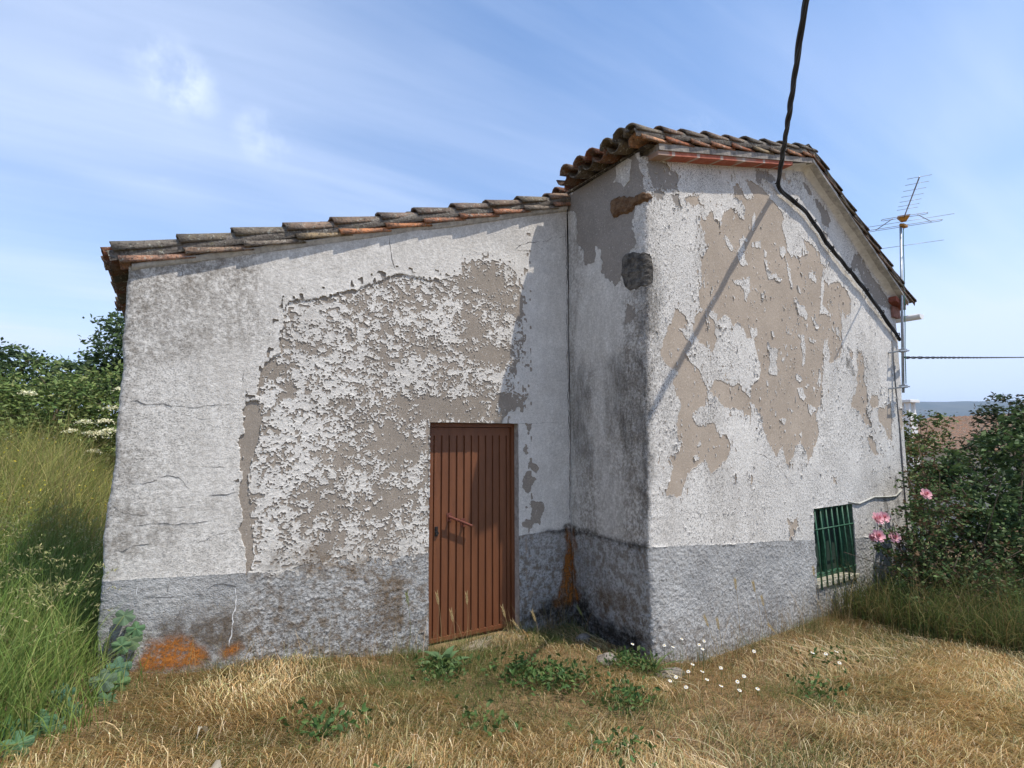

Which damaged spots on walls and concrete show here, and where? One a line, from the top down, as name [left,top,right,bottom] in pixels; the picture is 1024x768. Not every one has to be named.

crack [110,466,238,552]
peeling [234,250,545,599]
rust [555,531,579,607]
peeling [568,155,903,511]